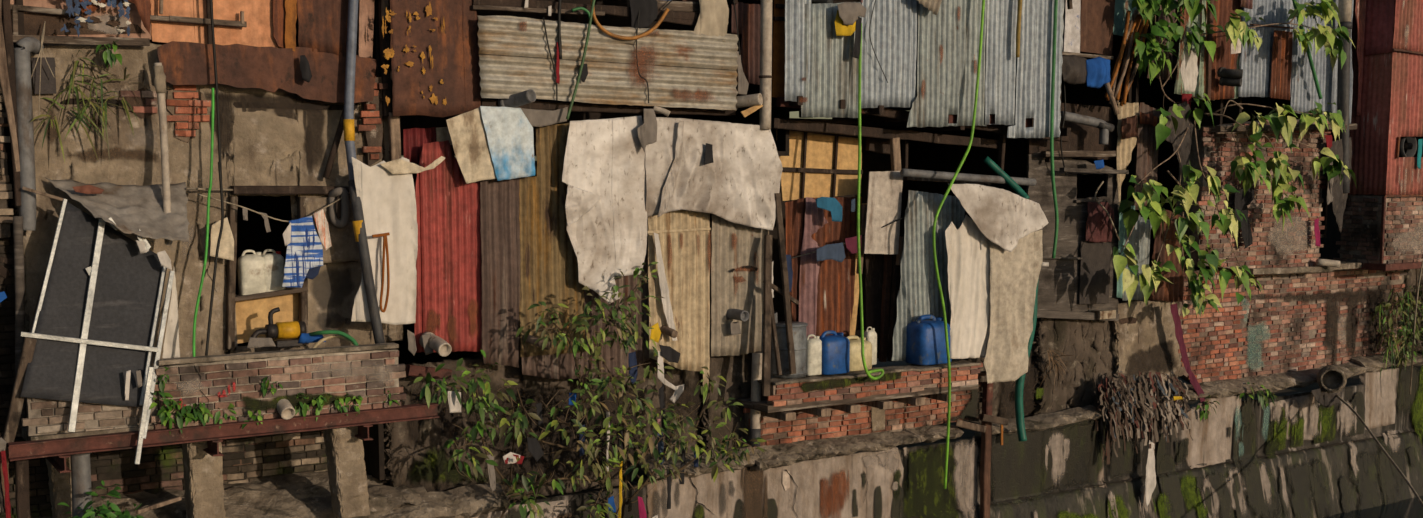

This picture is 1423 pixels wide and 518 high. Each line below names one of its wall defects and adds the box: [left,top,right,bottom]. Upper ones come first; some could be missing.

corrosion [674,90,708,100]
damp [926,376,979,427]
damp [954,366,1420,518]